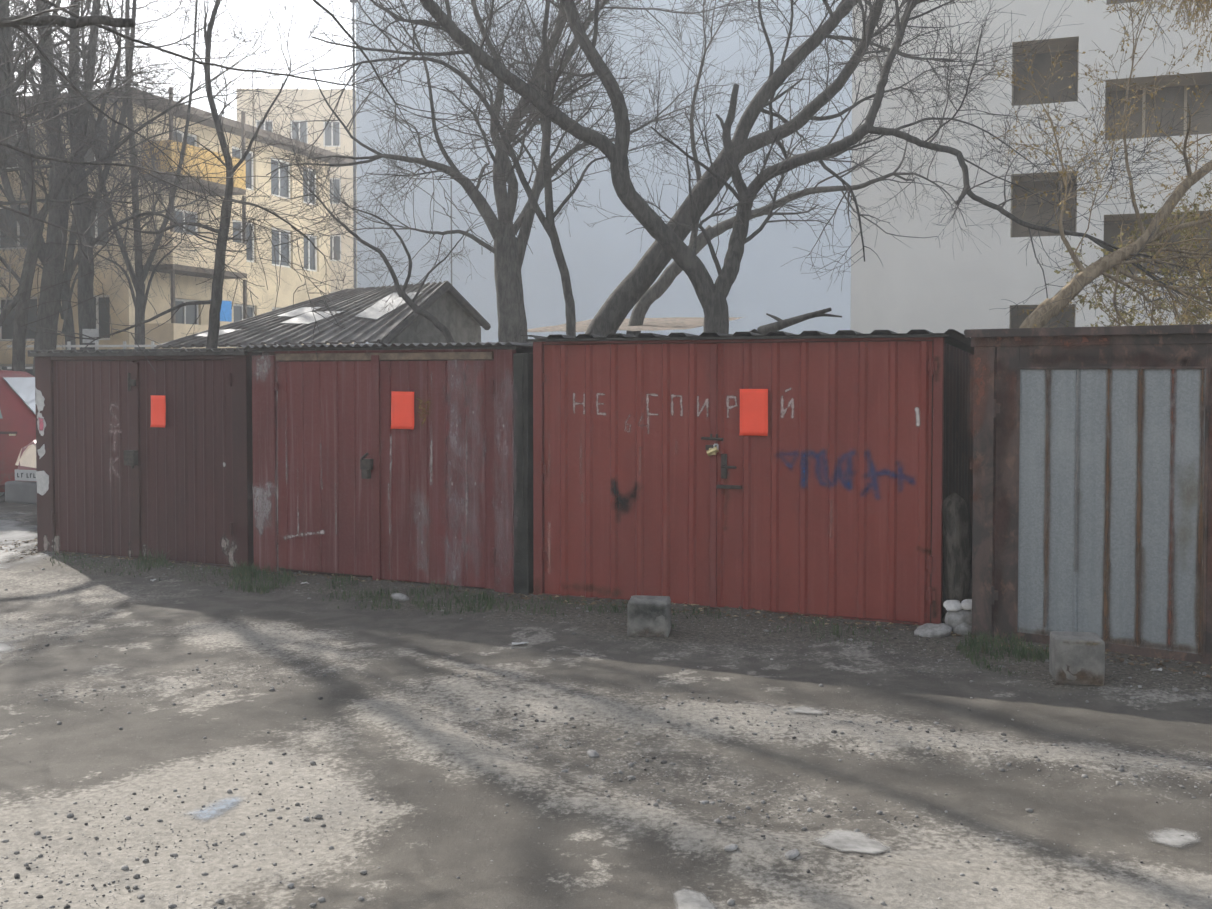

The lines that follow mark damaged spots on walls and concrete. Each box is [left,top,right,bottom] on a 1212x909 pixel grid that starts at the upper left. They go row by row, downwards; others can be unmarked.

peeling [253,485,271,534]
rust [976,335,1204,654]
peeling [221,536,237,567]